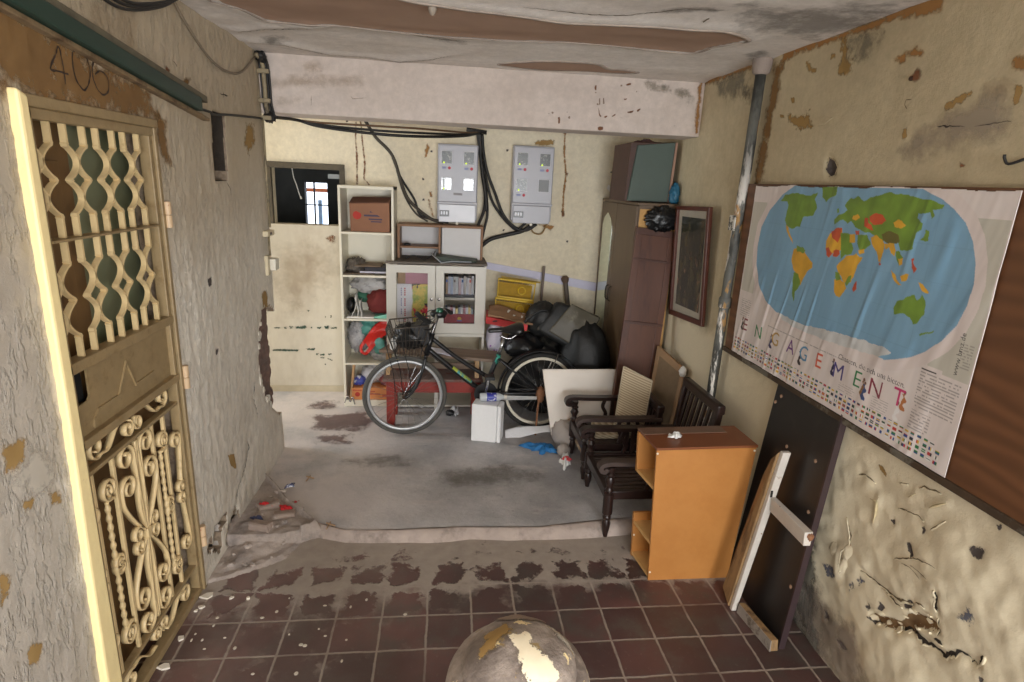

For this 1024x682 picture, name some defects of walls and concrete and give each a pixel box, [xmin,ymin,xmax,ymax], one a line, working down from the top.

damp [782,0,943,76]
peeling [1012,56,1024,70]
peeling [780,97,832,130]
corrosion [543,133,568,230]
spalling [824,157,838,177]
flaking render [258,291,273,406]
damp [310,401,373,444]
peeling [15,450,55,496]
crack [859,473,946,531]
flaking render [865,600,939,635]
crack [838,517,986,668]
peeling [509,631,560,682]